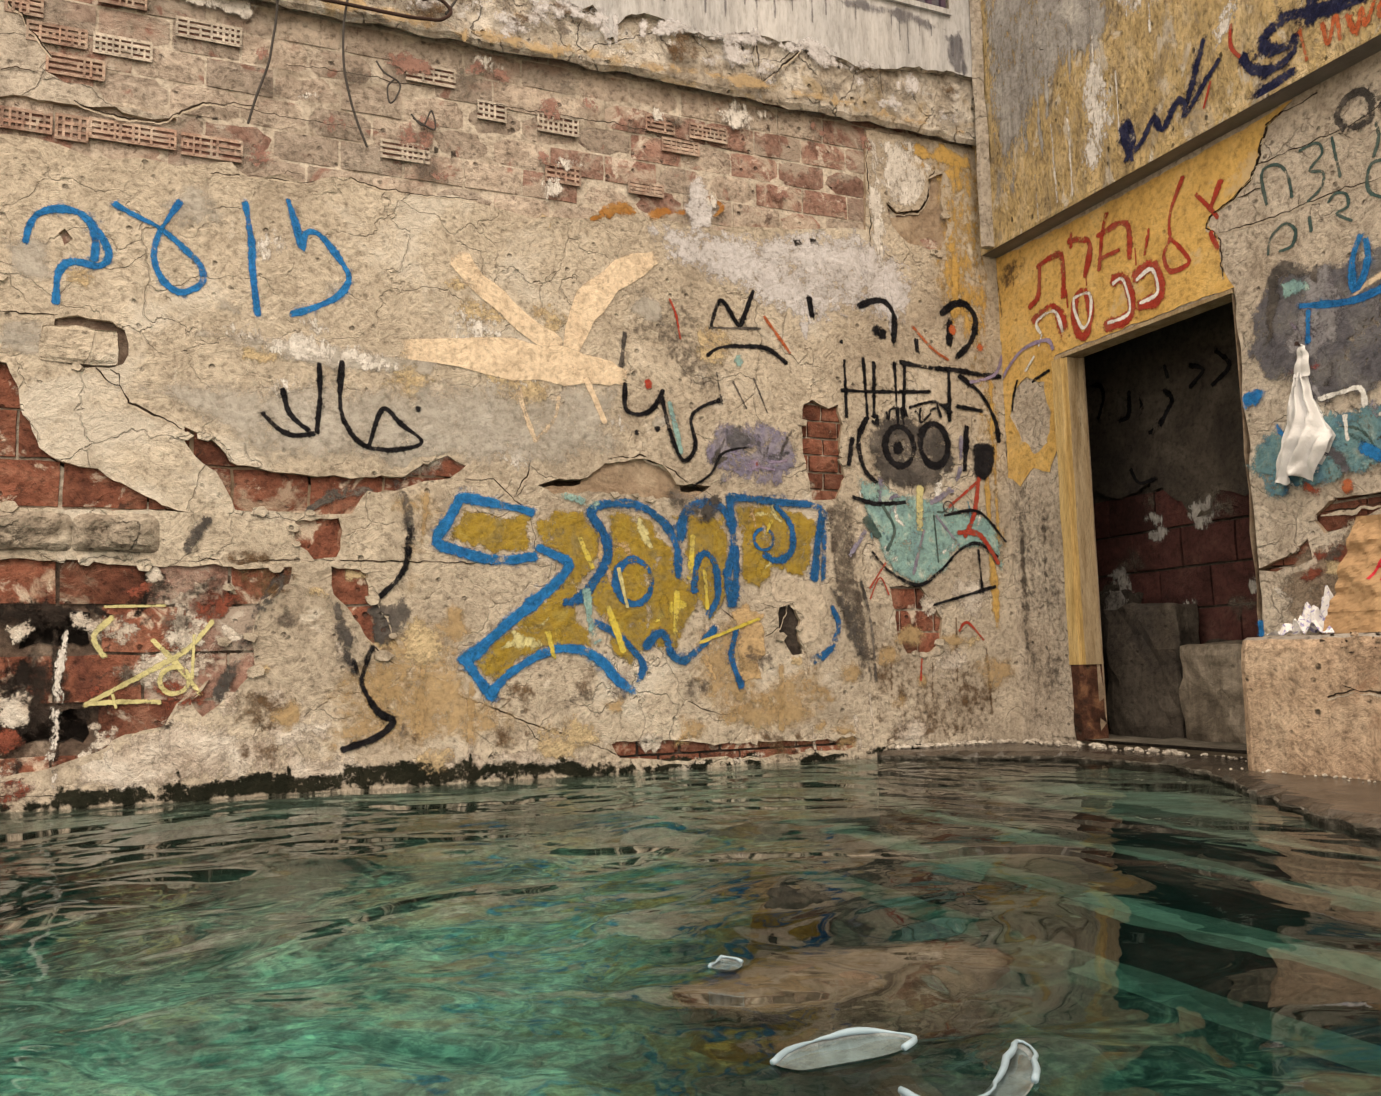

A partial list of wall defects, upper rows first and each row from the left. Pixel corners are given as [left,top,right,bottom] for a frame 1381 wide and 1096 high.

crack [3,309,58,317]
flaking render [0,361,174,512]
crack [95,368,187,432]
flaking render [797,401,847,500]
flaking render [176,428,465,661]
crack [172,451,563,567]
flaking render [1270,493,1381,620]
flaking render [0,554,292,778]
damp [0,551,600,807]
damp [607,665,633,711]
damp [637,721,704,766]
crack [1327,685,1381,701]